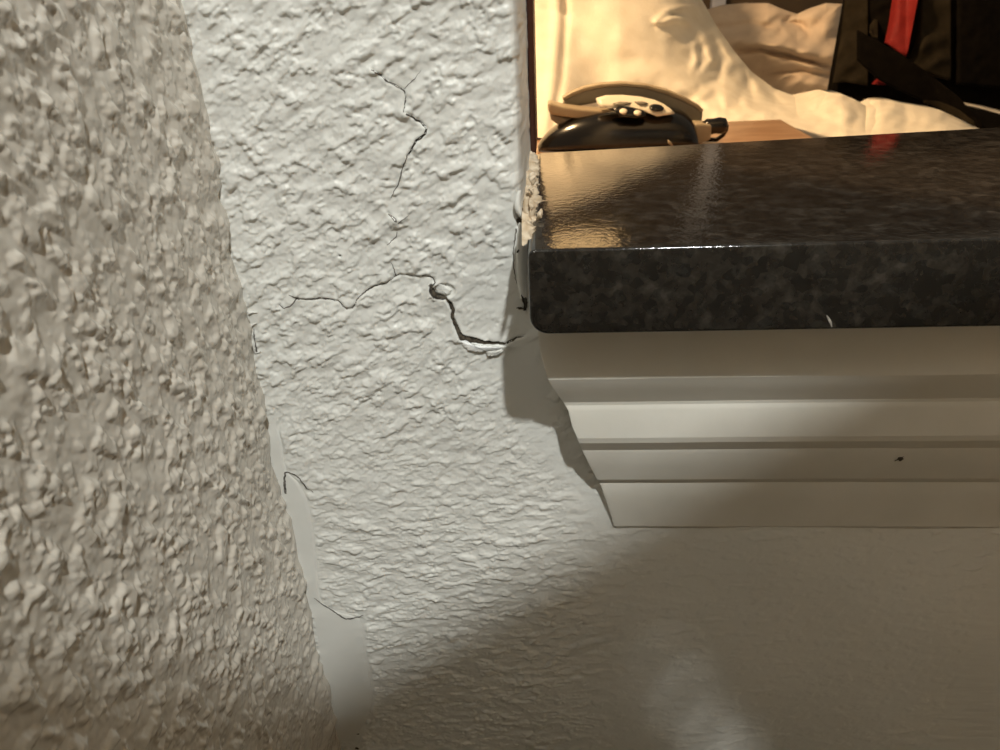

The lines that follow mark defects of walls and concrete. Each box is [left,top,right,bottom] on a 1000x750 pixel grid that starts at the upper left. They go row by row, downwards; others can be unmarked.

crack [280,70,523,357]
flaking render [514,151,547,246]
peeling [266,424,373,741]